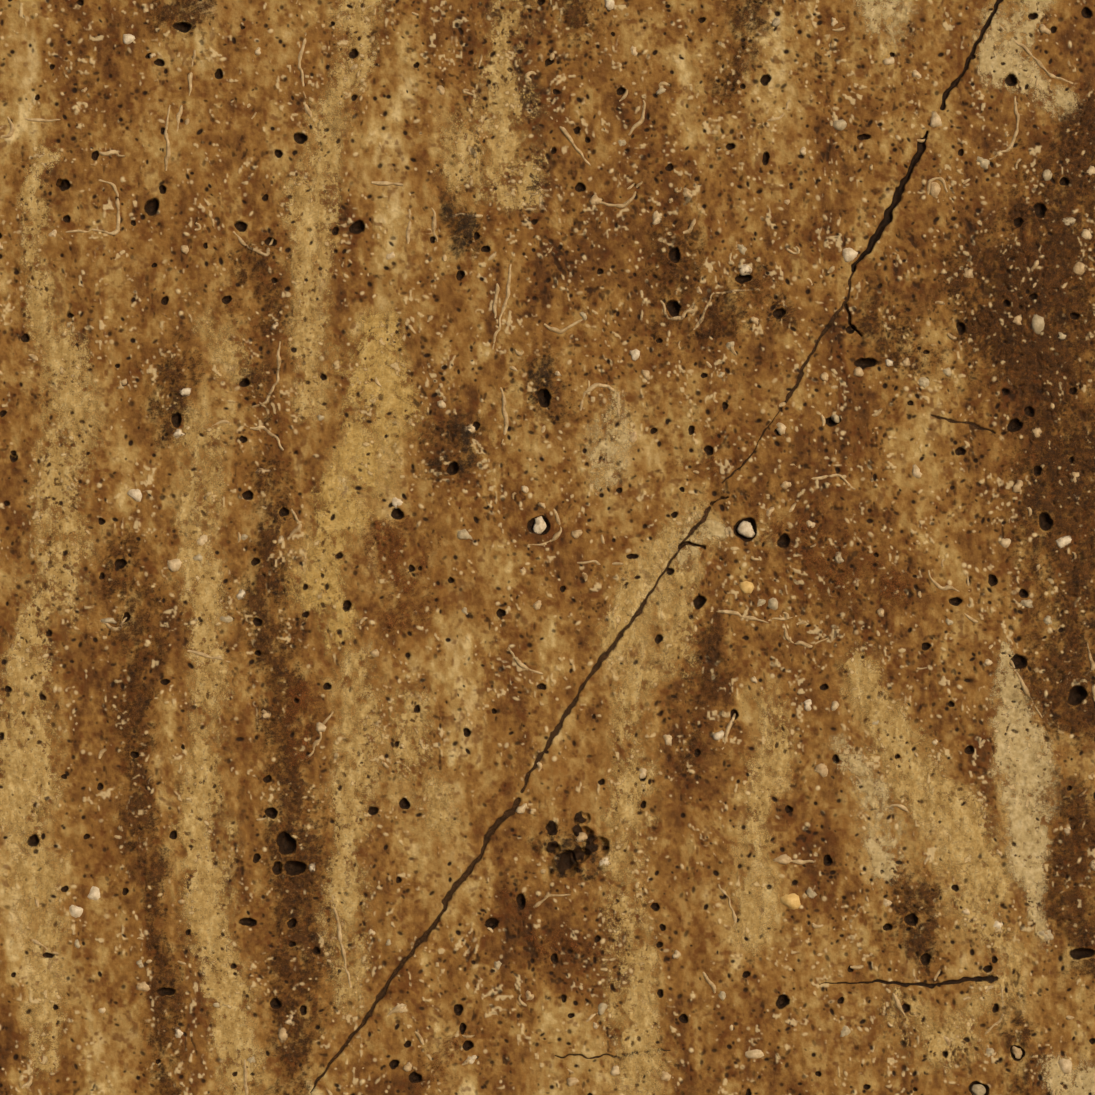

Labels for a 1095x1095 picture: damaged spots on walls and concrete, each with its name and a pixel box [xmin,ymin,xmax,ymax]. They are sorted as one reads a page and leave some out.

leakage [440,0,548,258]
leakage [559,0,590,40]
leakage [712,0,773,100]
leakage [0,0,481,1095]
leakage [526,354,569,421]
leakage [586,391,632,489]
crack [310,0,1003,1093]
leakage [643,220,797,349]
leakage [832,0,1095,1095]
leakage [531,502,732,1095]
leakage [732,680,797,956]